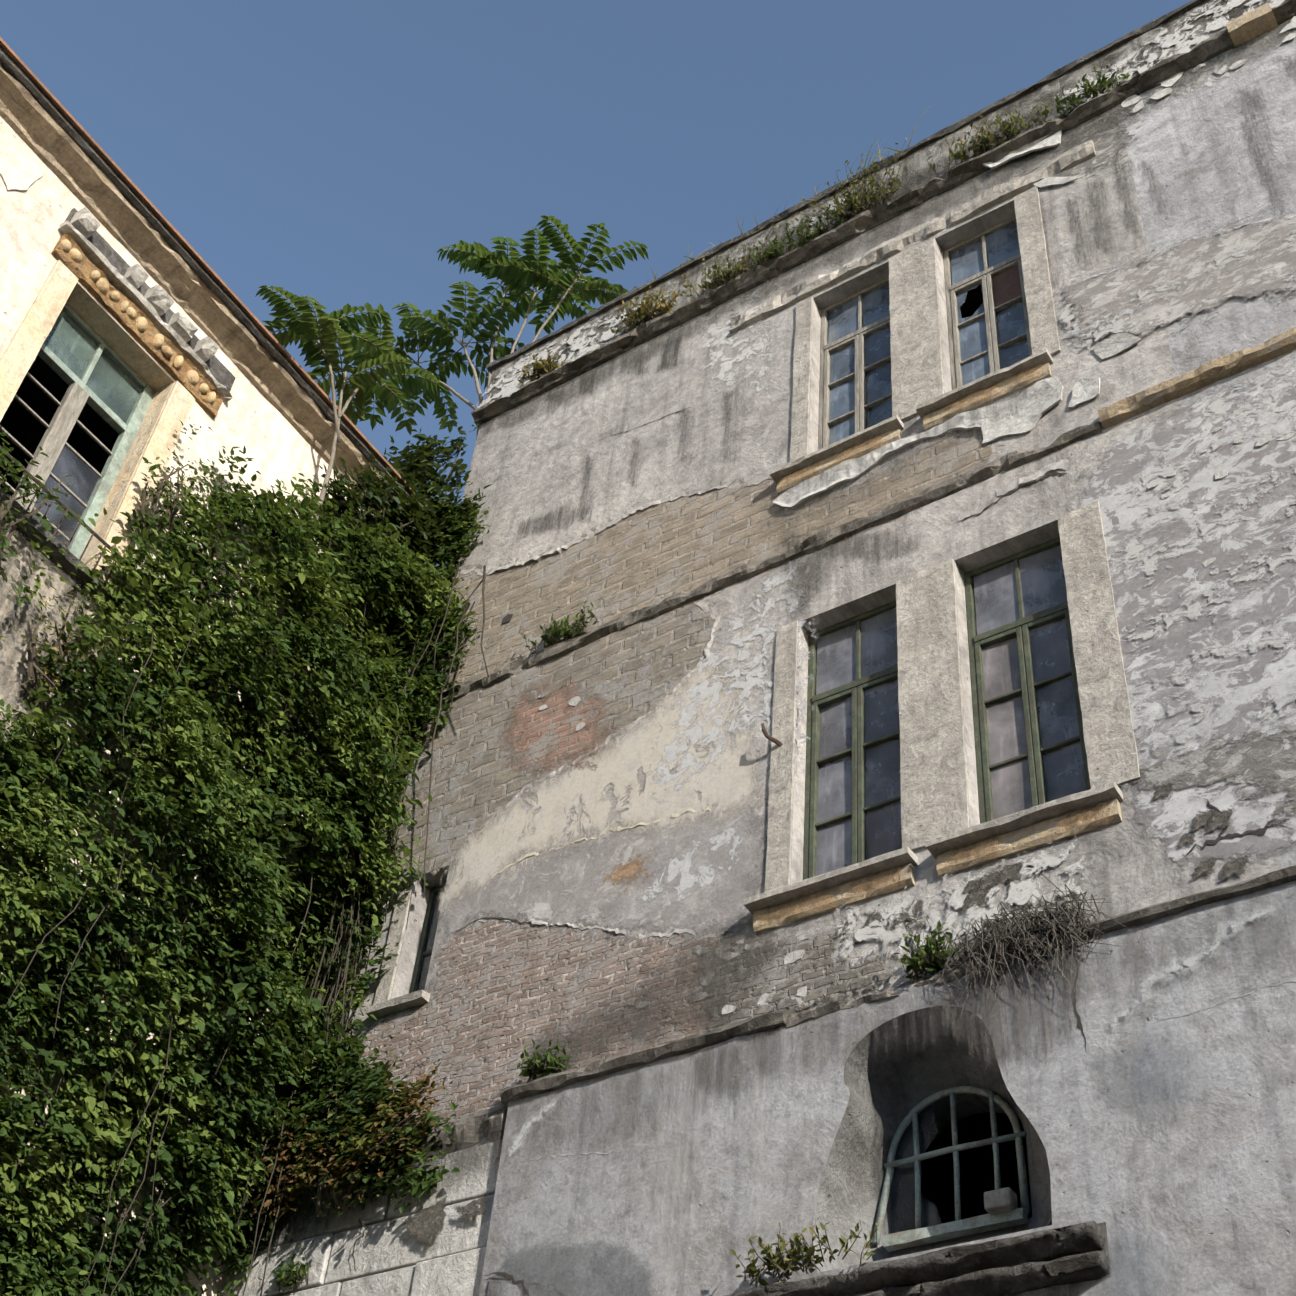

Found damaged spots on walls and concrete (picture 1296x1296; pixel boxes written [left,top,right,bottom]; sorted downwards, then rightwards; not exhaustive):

water stain [485,17,1293,431]
peeling [983,0,1296,192]
crack [455,917,567,932]
water stain [522,457,592,534]
spalling [350,376,1100,1131]
peeling [1069,352,1296,880]